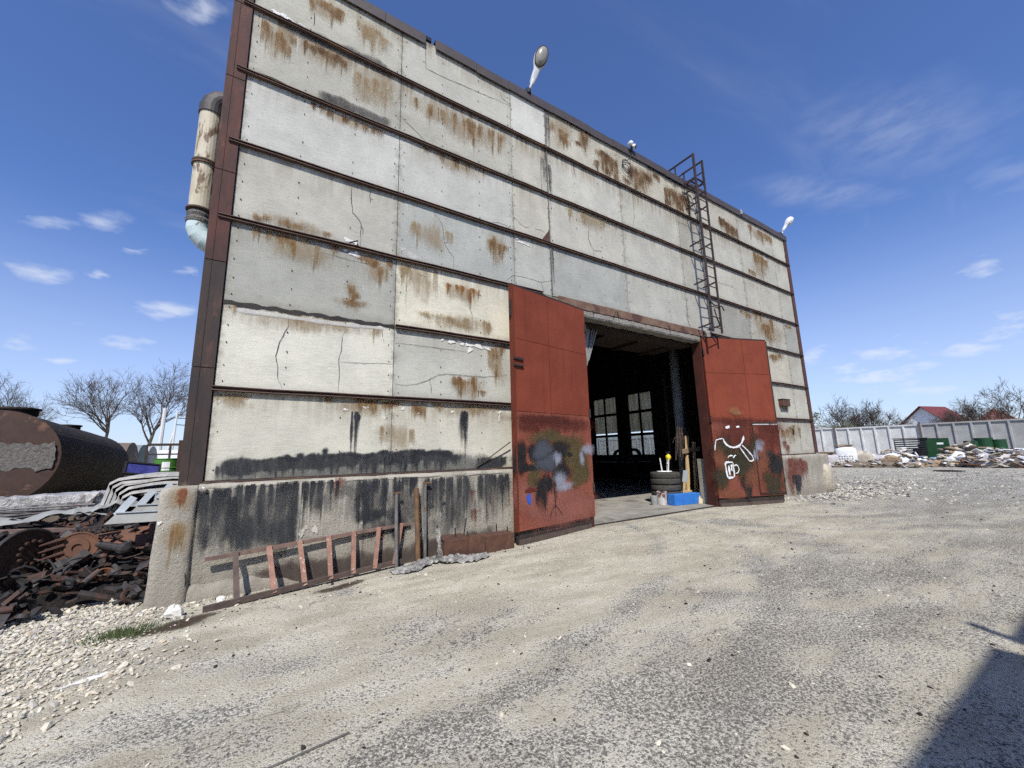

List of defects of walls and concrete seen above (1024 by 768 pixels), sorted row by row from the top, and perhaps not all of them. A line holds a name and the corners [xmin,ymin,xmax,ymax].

rust [309,0,344,25]
rust [260,18,390,107]
rust [414,97,503,152]
rust [549,122,691,214]
crack [337,189,393,270]
rust [719,216,772,241]
rust [423,312,490,332]
crack [338,332,506,393]
rust [452,376,499,414]
rust [170,488,189,508]
damp [195,454,509,540]
damp [258,534,445,582]